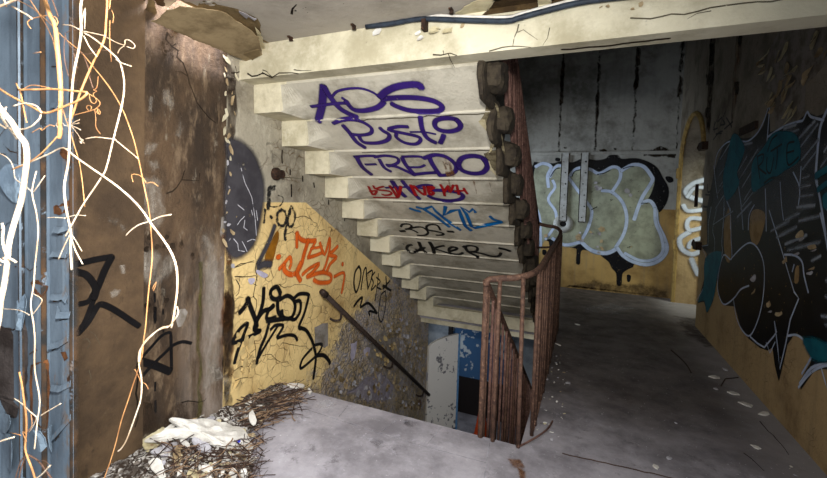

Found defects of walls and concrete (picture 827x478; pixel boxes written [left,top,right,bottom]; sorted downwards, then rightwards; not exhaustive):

crack [630,0,780,20]
spalling [478,103,500,130]
spalling [484,134,506,178]
peeling [53,200,71,215]
peeling [0,294,52,473]